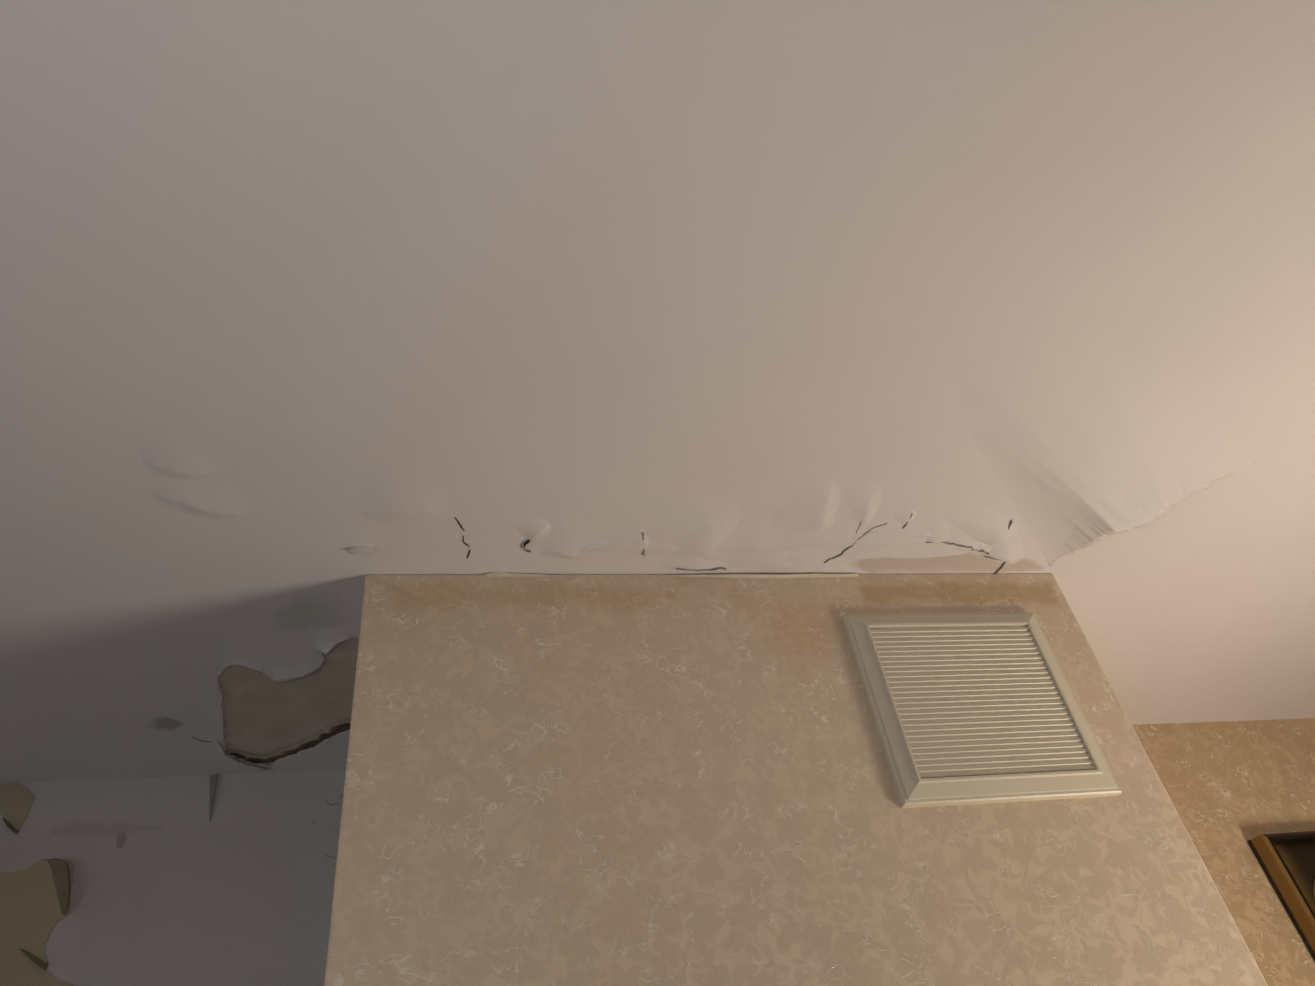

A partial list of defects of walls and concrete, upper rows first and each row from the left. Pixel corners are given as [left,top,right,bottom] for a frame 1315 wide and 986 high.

flaking render [209,627,359,771]
water stain [261,549,1072,708]